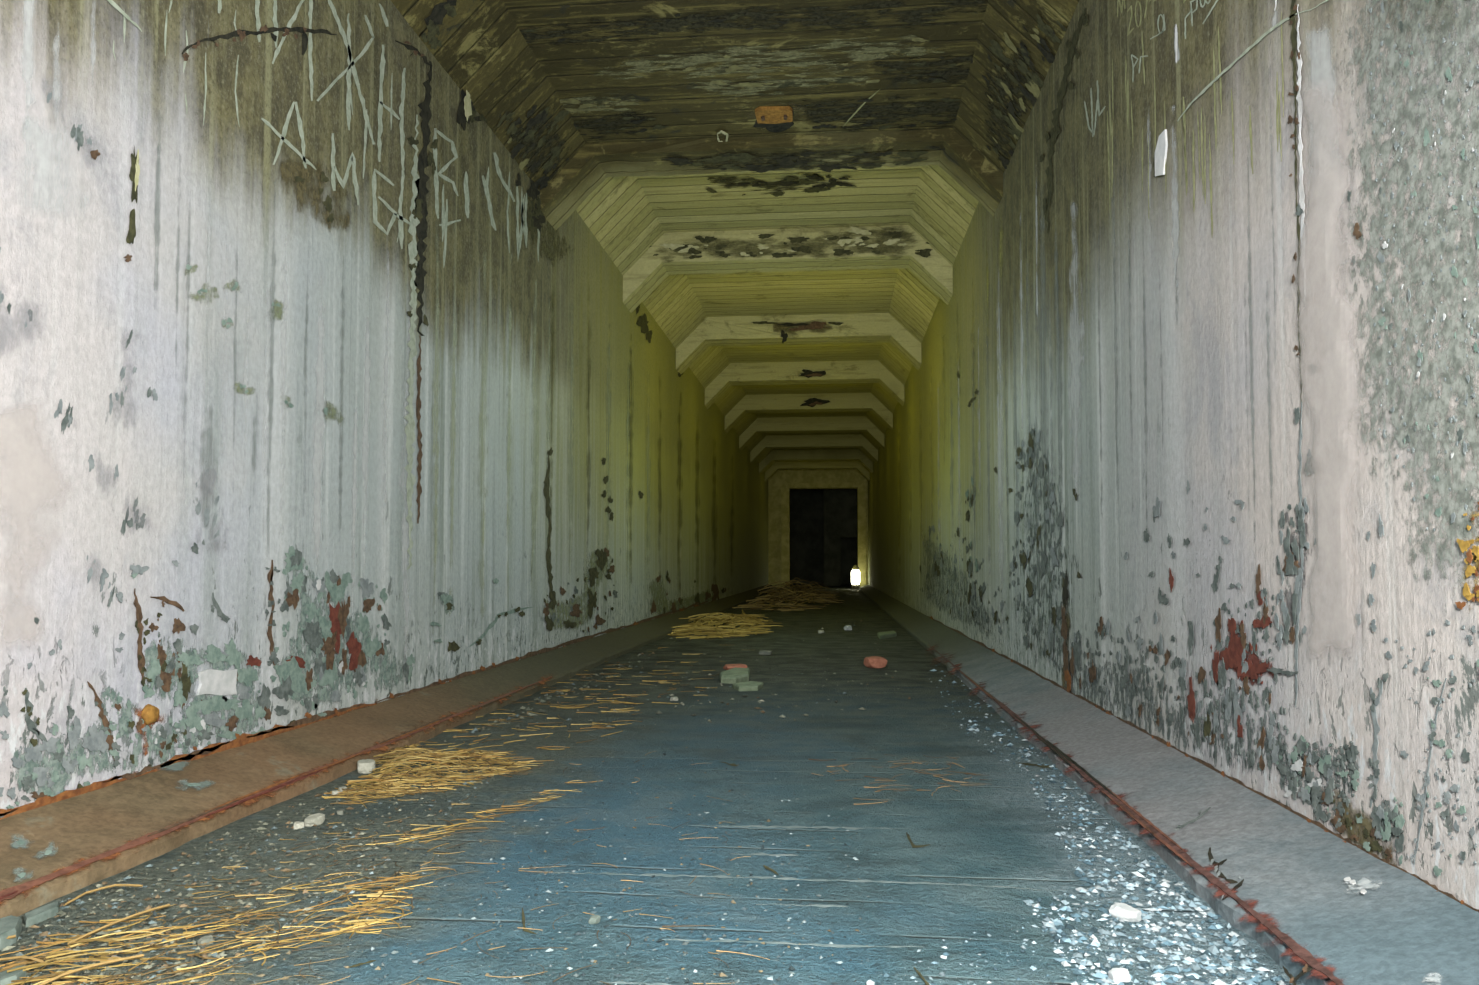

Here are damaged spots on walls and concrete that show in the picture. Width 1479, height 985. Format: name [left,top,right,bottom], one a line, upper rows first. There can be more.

leakage [25,0,33,104]
peeling [559,35,945,113]
corrosion [280,158,350,229]
leakage [254,372,284,468]
leakage [920,229,1084,571]
leakage [1249,273,1272,497]
peeling [12,546,415,800]
corrosion [0,601,708,819]
peeling [543,547,618,632]
peeling [920,427,1359,828]
corrosion [925,570,1479,985]
peeling [1371,797,1407,865]